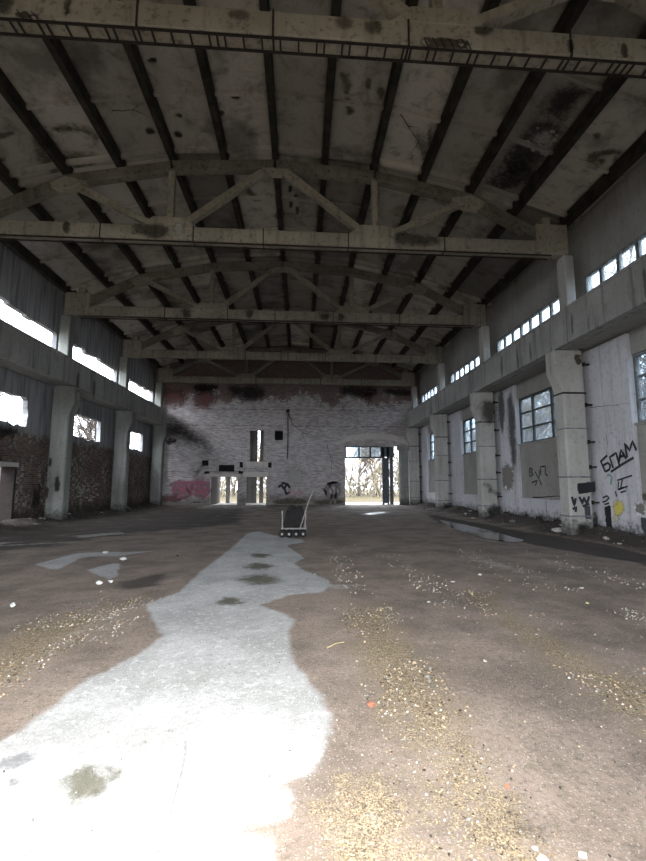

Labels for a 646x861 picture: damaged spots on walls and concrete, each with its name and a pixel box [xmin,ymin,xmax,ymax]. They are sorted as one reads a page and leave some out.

spalling [420,33,472,50]
water stain [483,392,516,464]